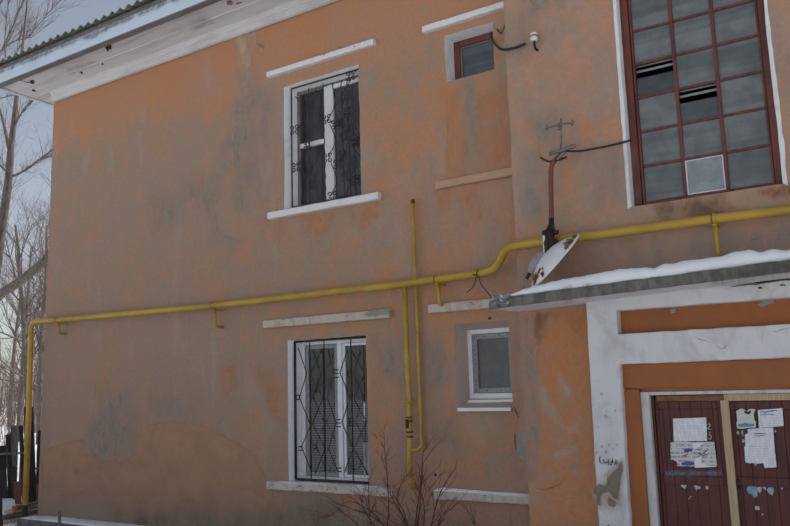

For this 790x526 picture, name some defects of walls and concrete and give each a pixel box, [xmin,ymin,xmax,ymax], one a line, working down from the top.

damp [684,200,722,215]
peeling [593,462,623,507]